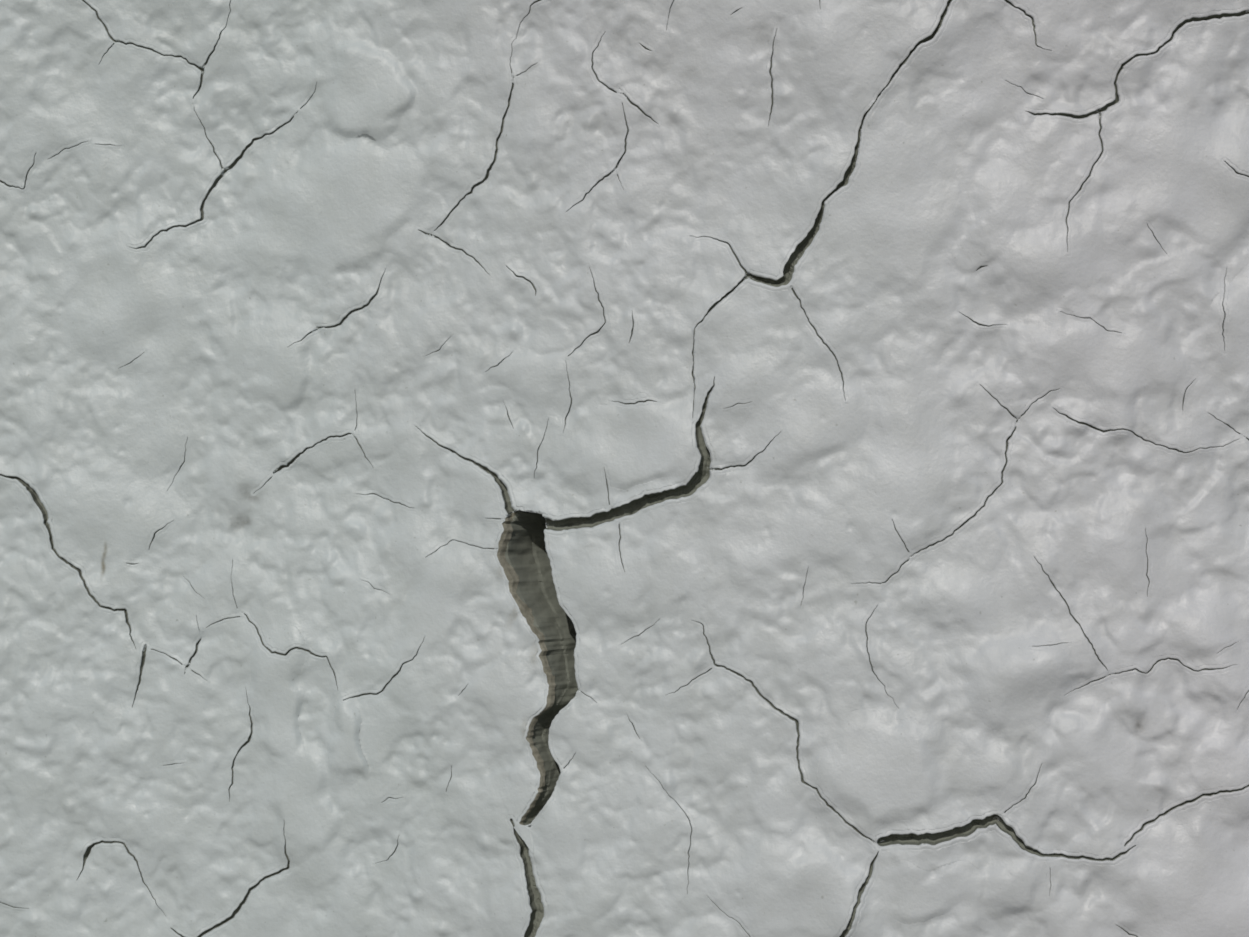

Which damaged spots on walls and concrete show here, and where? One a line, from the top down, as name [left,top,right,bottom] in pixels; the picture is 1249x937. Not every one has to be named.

crack [0,138,124,193]
crack [74,0,320,252]
crack [995,0,1249,258]
crack [283,265,389,351]
crack [122,434,191,568]
crack [0,471,429,711]
crack [249,386,418,512]
crack [411,0,957,937]
crack [848,374,1249,714]
crack [73,817,293,937]
crack [225,684,256,805]
crack [617,615,1249,937]